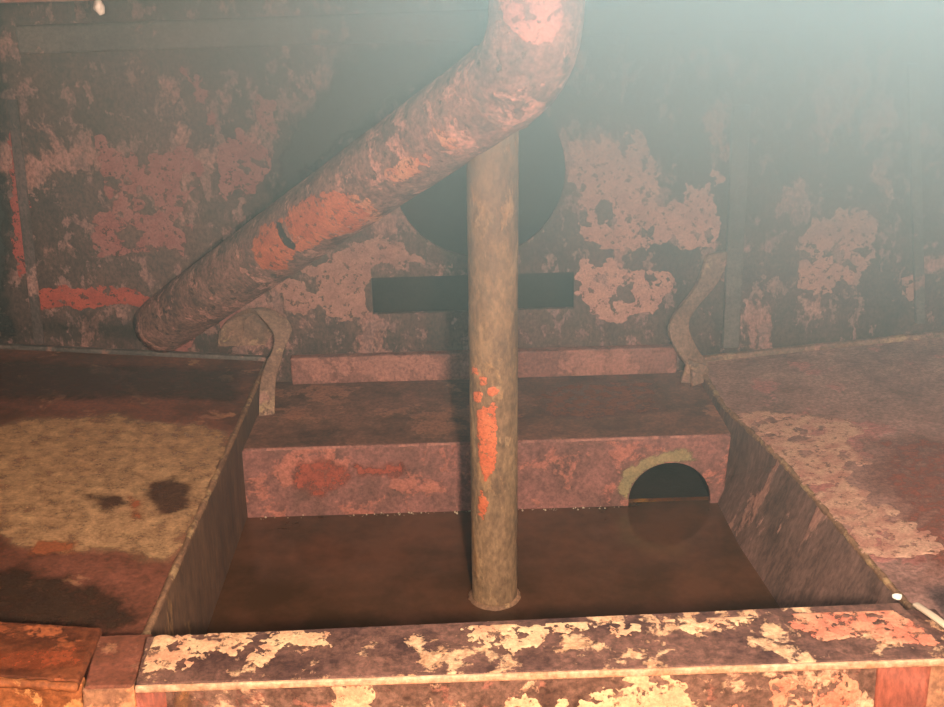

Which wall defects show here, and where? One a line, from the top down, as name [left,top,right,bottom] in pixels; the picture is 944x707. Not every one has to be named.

peeling [93,0,105,15]
peeling [567,129,726,324]
damp [0,360,237,401]
damp [0,568,136,630]
peeling [330,685,375,707]
peeling [504,693,542,707]
peeling [555,675,695,707]